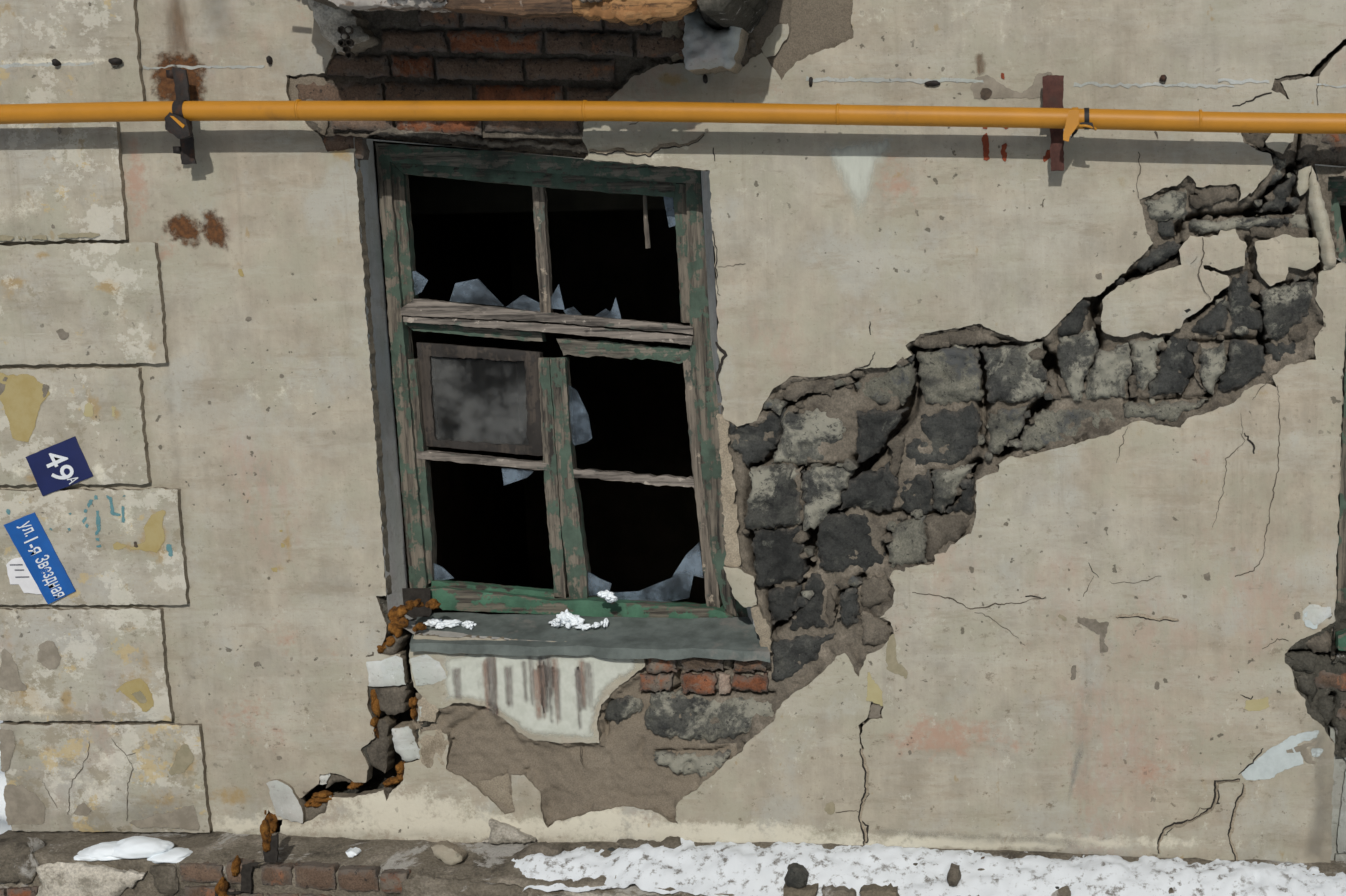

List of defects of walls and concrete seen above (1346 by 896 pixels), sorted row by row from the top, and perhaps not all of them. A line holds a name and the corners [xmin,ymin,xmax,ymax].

rust [152,53,206,101]
flaking render [289,9,696,101]
flaking render [741,0,854,80]
rust [970,56,1053,100]
crack [1232,92,1272,107]
flaking render [1271,39,1346,99]
flaking render [306,121,588,161]
rust [982,127,1008,162]
rust [164,210,227,248]
flaking render [412,133,1346,826]
crack [214,588,447,896]
crack [1157,748,1264,861]